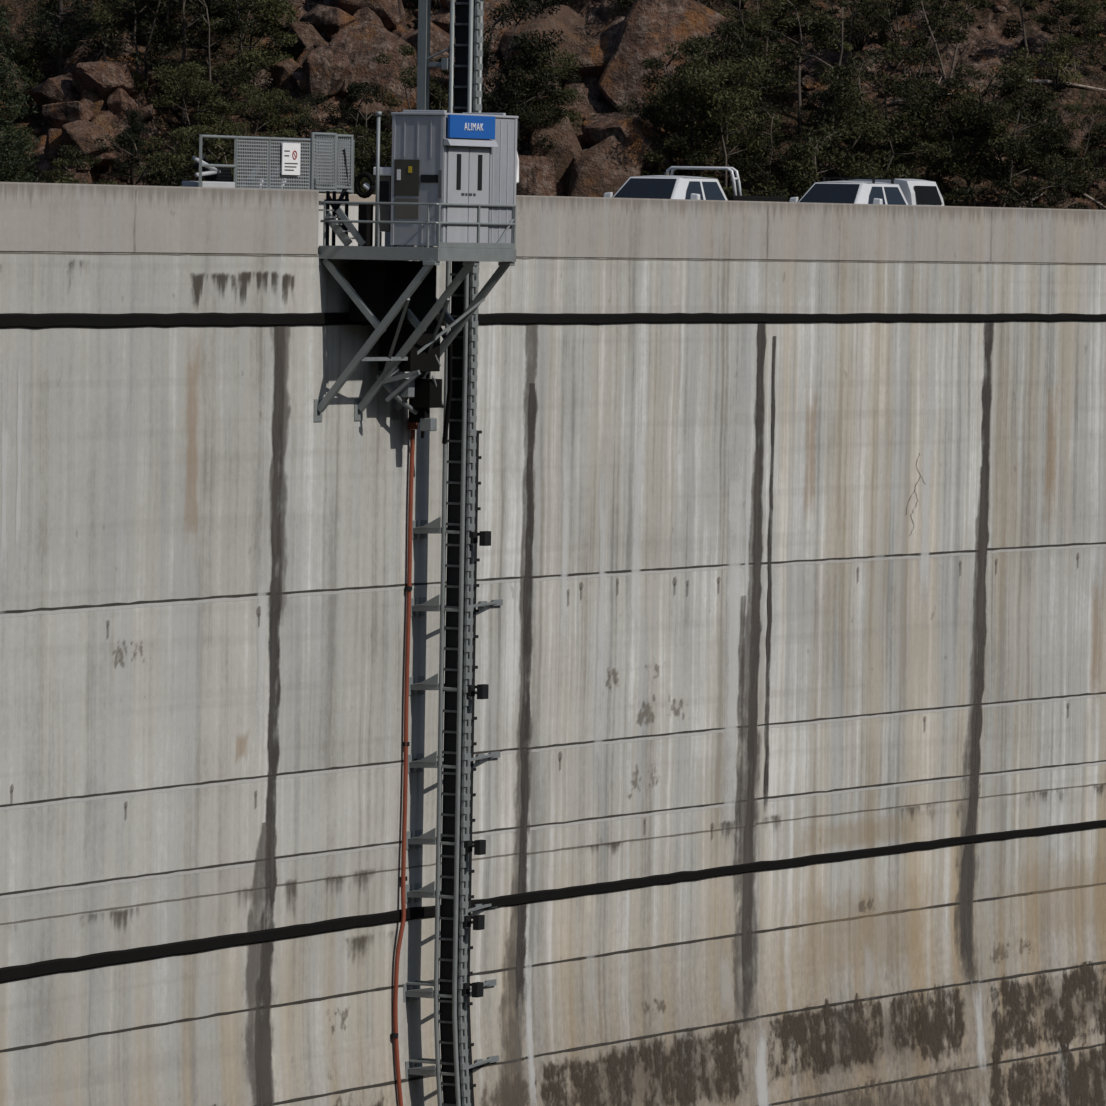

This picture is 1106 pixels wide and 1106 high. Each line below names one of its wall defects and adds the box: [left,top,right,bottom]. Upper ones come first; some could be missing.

damp [193,271,294,305]
crack [477,453,1106,584]
crack [0,582,441,618]
damp [246,326,296,1106]
damp [722,323,776,1013]
damp [955,321,994,976]
efflorescence [756,1041,768,1106]
damp [976,1004,984,1063]